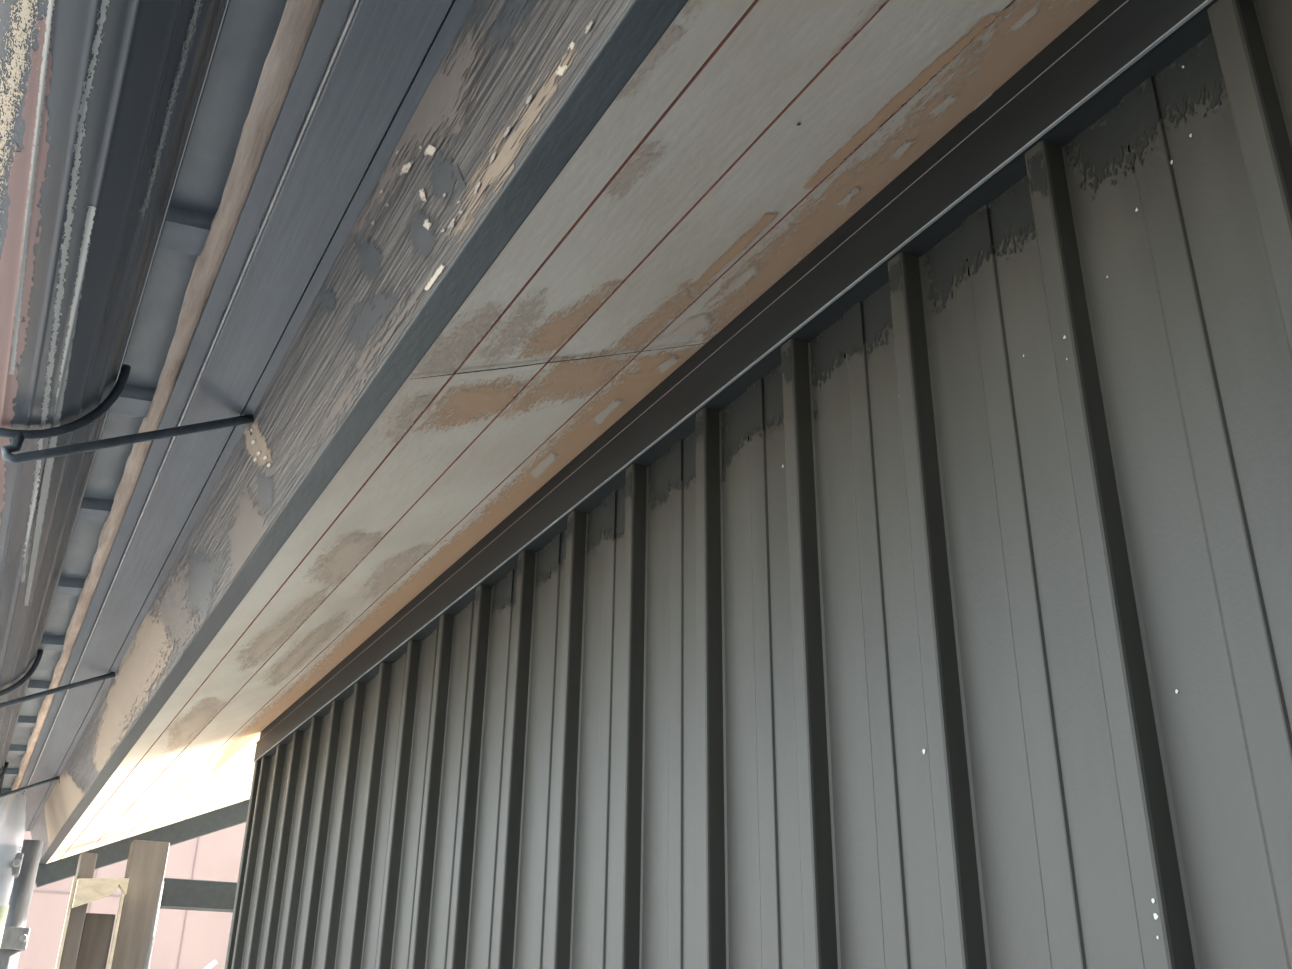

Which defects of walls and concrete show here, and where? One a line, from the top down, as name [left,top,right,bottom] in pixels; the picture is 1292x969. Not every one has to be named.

leakage [1065,32,1229,198]
rust [0,16,52,525]
peeling [205,0,1098,778]
leakage [810,260,902,420]
leakage [921,150,1047,313]